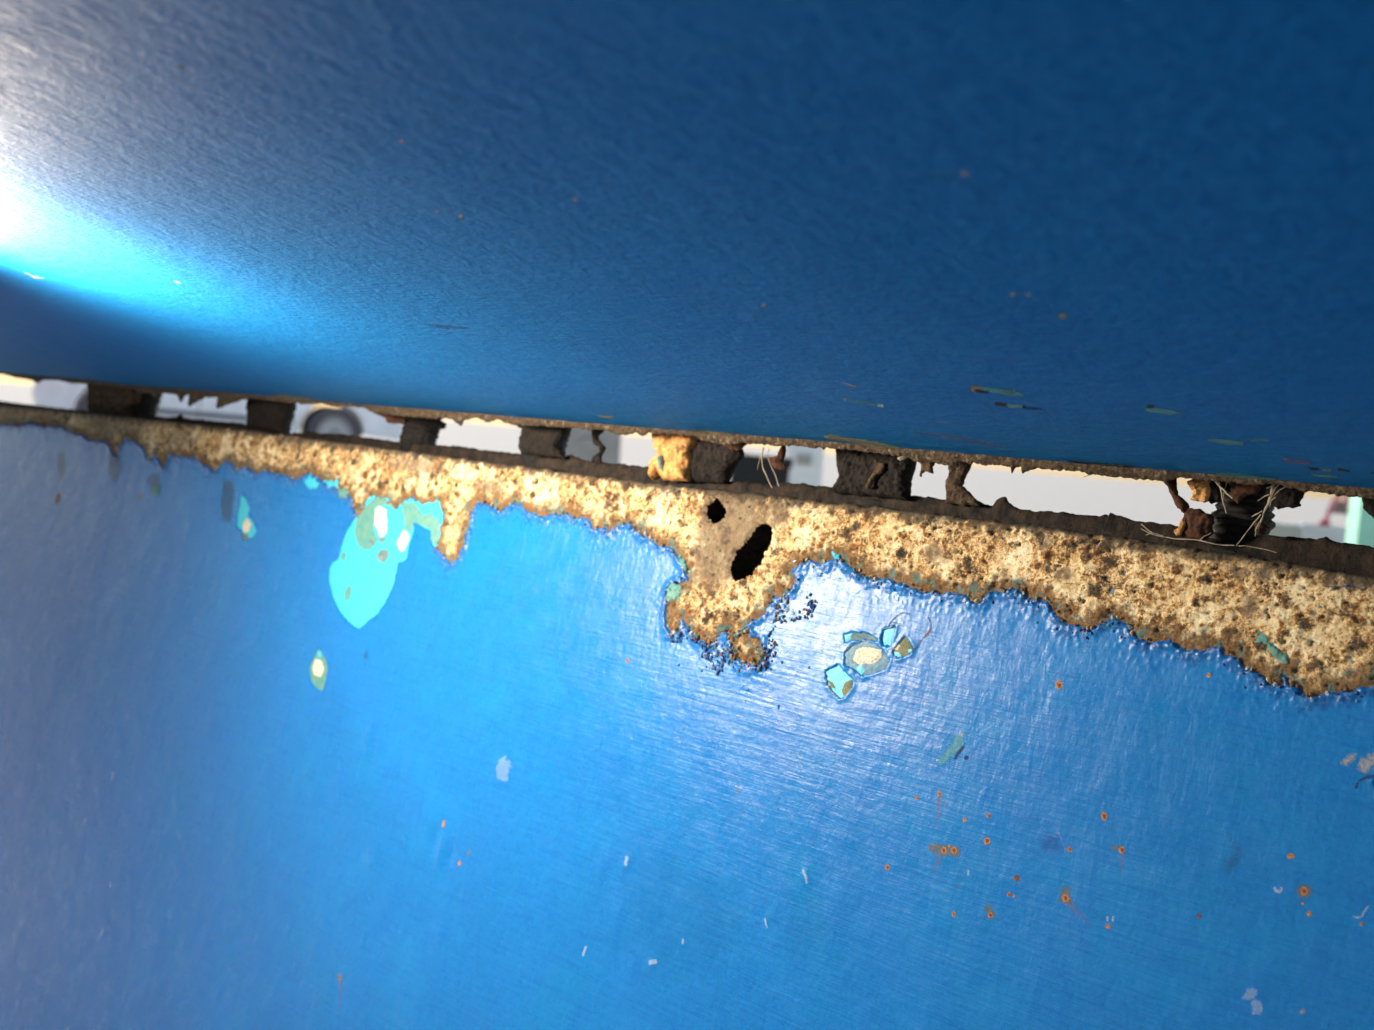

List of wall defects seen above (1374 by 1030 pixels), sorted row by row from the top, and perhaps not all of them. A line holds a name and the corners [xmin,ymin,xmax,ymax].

peeling [824,434,902,449]
peeling [304,473,349,499]
peeling [237,495,256,540]
rust [0,372,1374,703]
peeling [329,495,443,628]
peeling [666,555,691,602]
peeling [309,649,328,691]
peeling [824,626,914,698]
peeling [1255,630,1288,664]